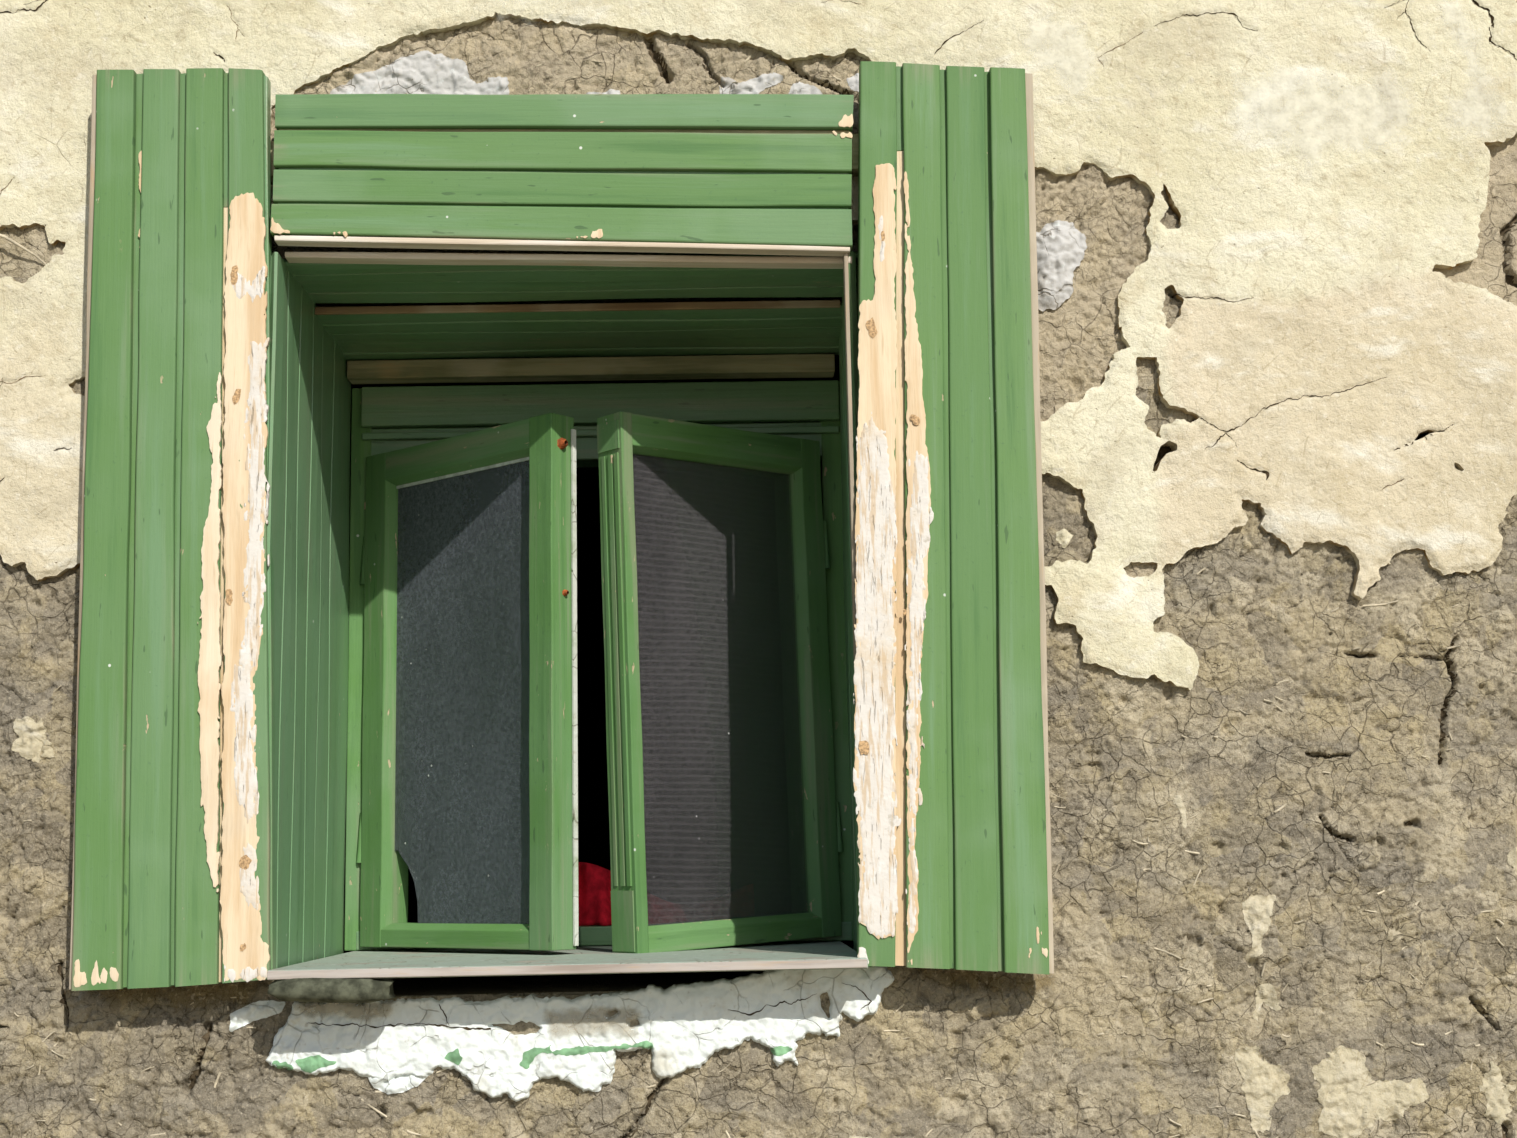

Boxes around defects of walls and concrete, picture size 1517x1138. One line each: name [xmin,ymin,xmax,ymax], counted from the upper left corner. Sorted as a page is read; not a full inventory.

crack [0,0,47,13]
flaking render [295,15,868,138]
crack [1473,0,1517,61]
flaking render [1035,164,1196,447]
flaking render [1432,136,1517,306]
crack [1500,214,1517,288]
crack [1193,377,1386,480]
peeling [198,193,270,983]
peeling [853,163,934,953]
crack [1344,637,1457,765]
flaking render [0,494,1517,1138]
crack [621,1079,665,1138]